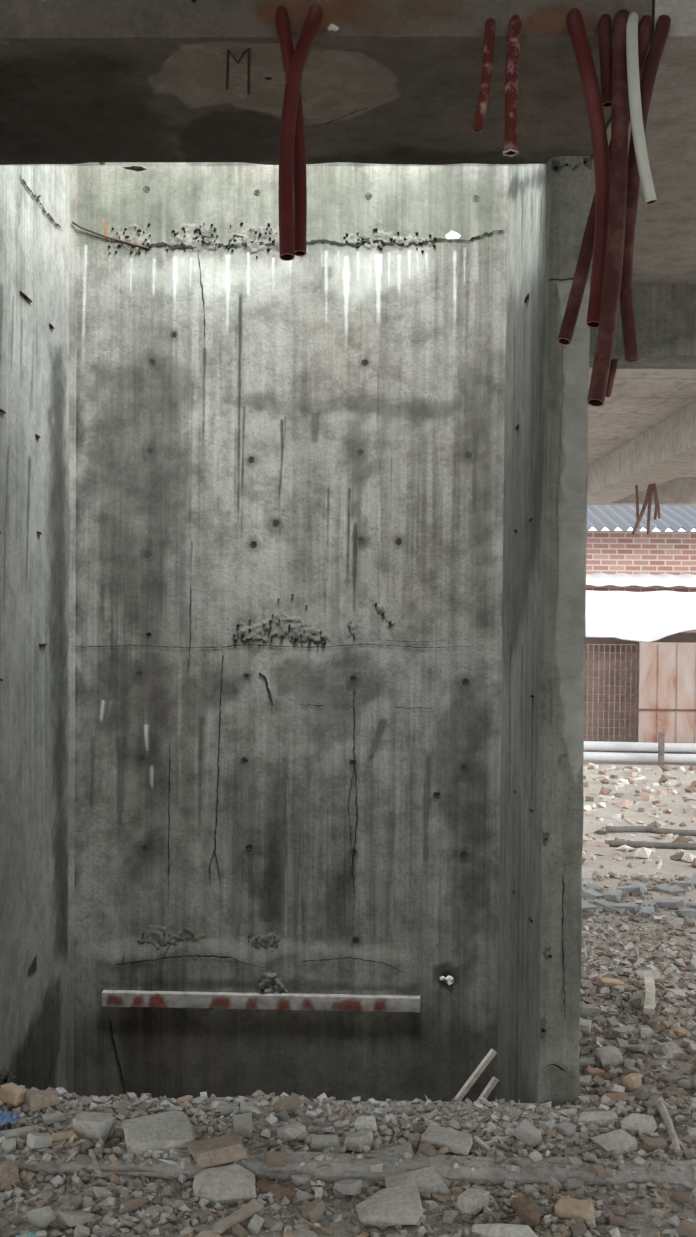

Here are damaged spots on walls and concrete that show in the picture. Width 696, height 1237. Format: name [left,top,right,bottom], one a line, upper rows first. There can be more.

spalling [107,223,152,254]
crack [116,938,265,968]